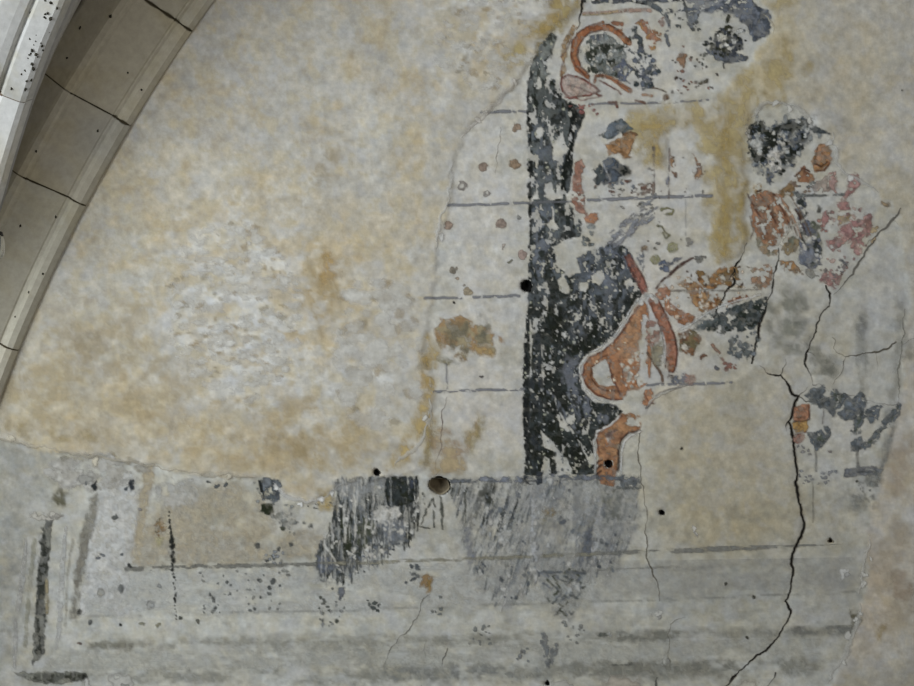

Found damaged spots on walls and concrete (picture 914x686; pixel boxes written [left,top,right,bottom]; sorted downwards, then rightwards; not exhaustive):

damp [692,70,754,255]
crack [713,258,741,318]
crack [804,208,901,369]
crack [843,328,905,388]
crack [726,248,808,686]